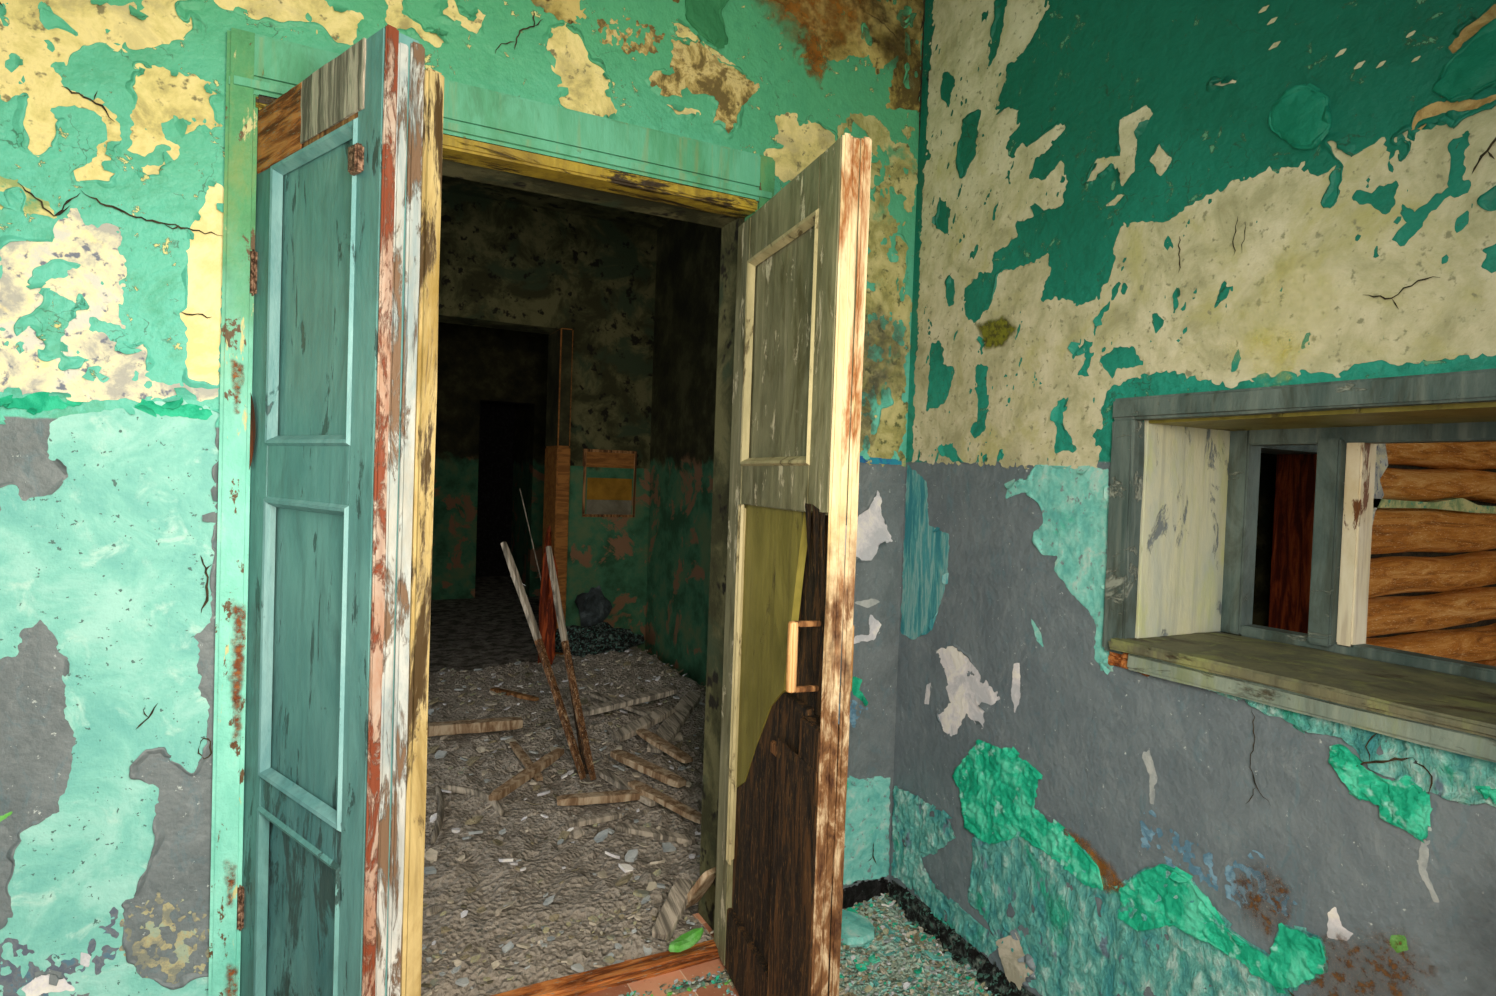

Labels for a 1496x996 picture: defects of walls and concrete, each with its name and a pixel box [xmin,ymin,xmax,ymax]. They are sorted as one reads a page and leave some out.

peeling [0,0,485,189]
peeling [531,0,760,139]
rust [762,0,867,89]
leakage [861,317,902,447]
peeling [764,0,1496,677]
peeling [0,176,224,996]
peeling [1207,689,1496,843]
peeling [843,702,1328,996]
rust [1313,934,1426,996]